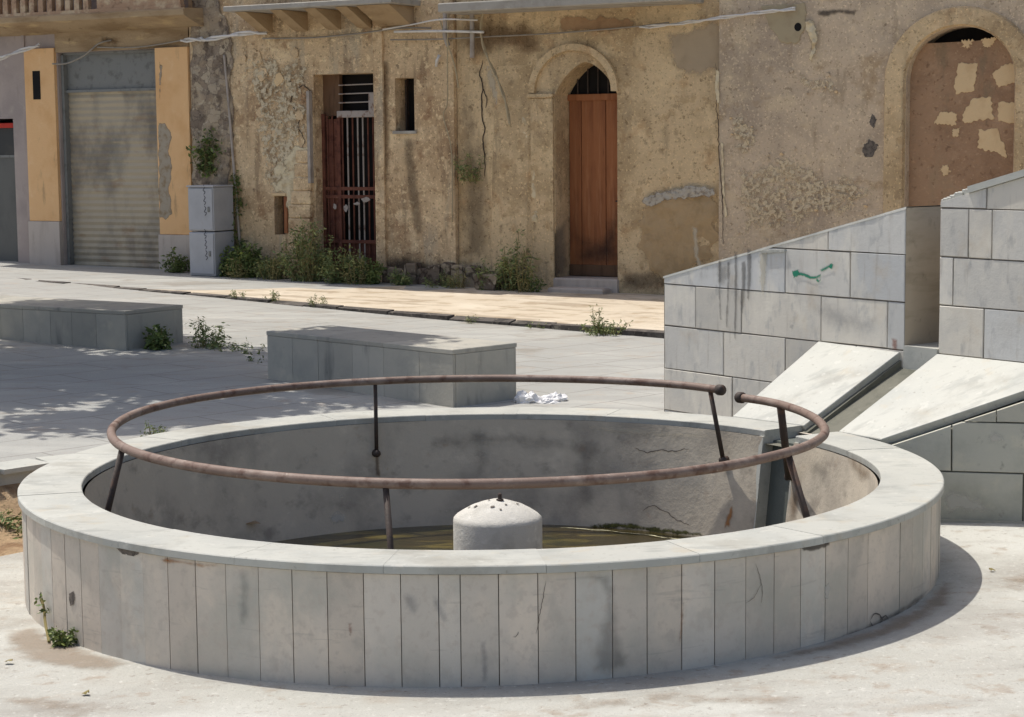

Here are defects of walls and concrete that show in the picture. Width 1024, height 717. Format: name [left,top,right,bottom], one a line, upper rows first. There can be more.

flaking render [961,37,997,49]
crack [479,60,487,177]
flaking render [934,62,1015,158]
peeling [158,123,172,219]